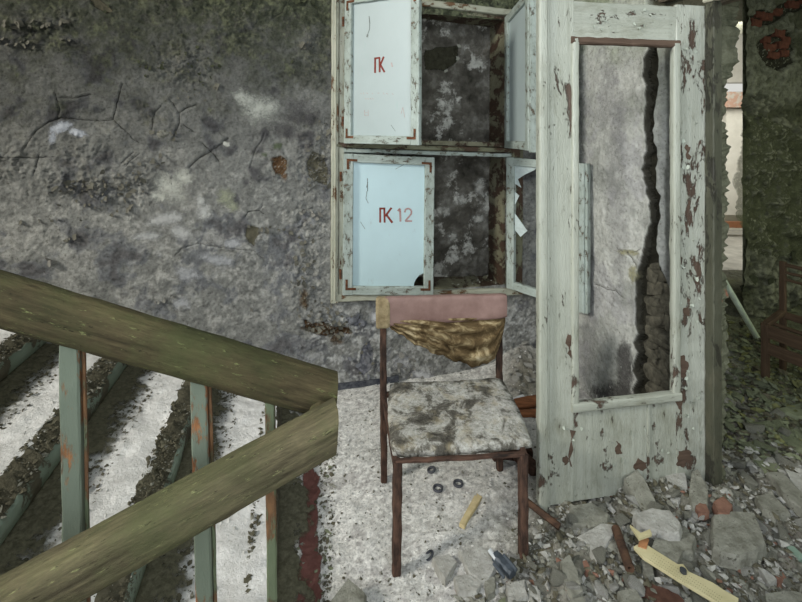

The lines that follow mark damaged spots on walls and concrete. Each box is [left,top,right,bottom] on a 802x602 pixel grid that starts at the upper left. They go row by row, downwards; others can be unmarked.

peeling [0,18,73,49]
flaking render [747,0,802,71]
crack [0,86,226,171]
peeling [681,132,691,169]
peeling [51,153,165,217]
peeling [245,209,364,341]
peeling [676,355,701,423]
peeling [562,426,583,467]
peeling [633,458,647,471]
peeling [661,449,692,468]